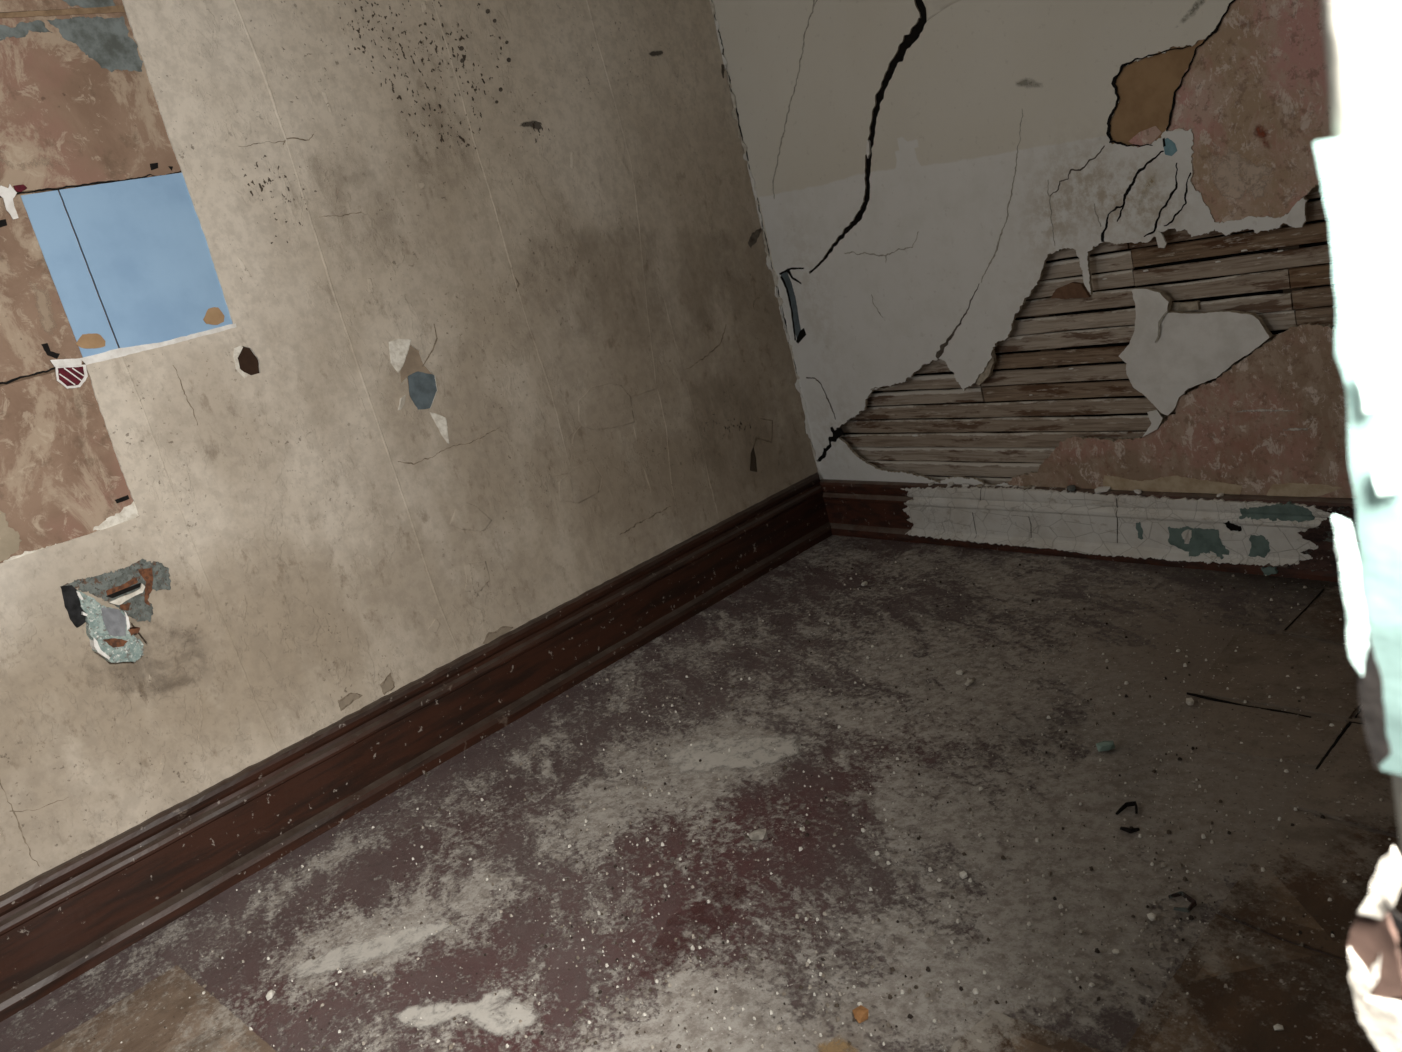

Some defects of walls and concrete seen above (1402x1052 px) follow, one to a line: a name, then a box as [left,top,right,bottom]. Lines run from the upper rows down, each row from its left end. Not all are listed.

peeling [0,0,182,563]
peeling [203,307,225,325]
spalling [233,345,259,378]
peeling [389,324,449,444]
water stain [338,0,511,154]
crack [806,377,845,462]
crack [810,0,927,273]
crack [936,109,1023,359]
crack [1047,146,1105,245]
spalling [840,0,1380,676]
crack [1094,151,1191,242]
spalling [60,585,110,660]